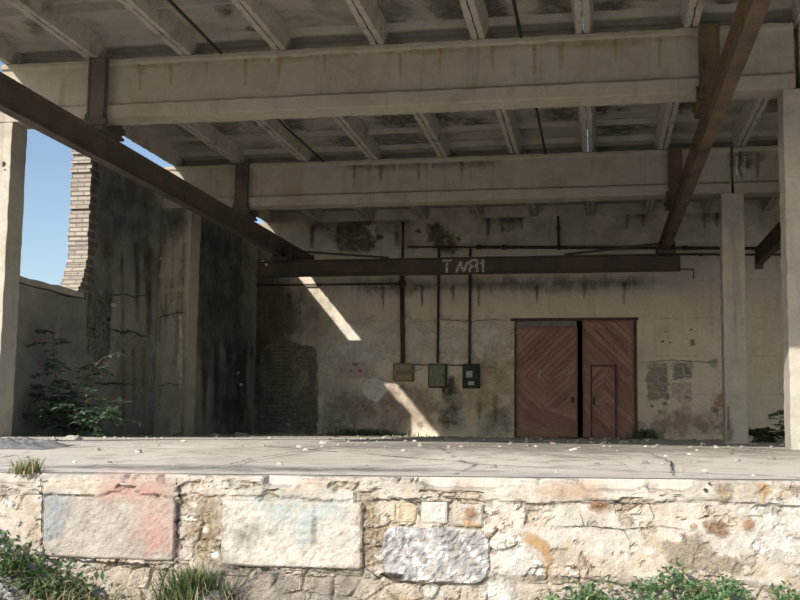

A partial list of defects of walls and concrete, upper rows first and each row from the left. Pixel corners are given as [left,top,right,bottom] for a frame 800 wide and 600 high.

water stain [428,0,463,19]
water stain [484,0,507,17]
water stain [594,0,630,11]
flaking render [327,221,384,252]
flaking render [415,223,460,254]
crack [107,326,148,337]
flaking render [258,317,513,435]
flaking render [646,362,723,436]
crack [558,500,694,554]
rust [523,536,551,574]